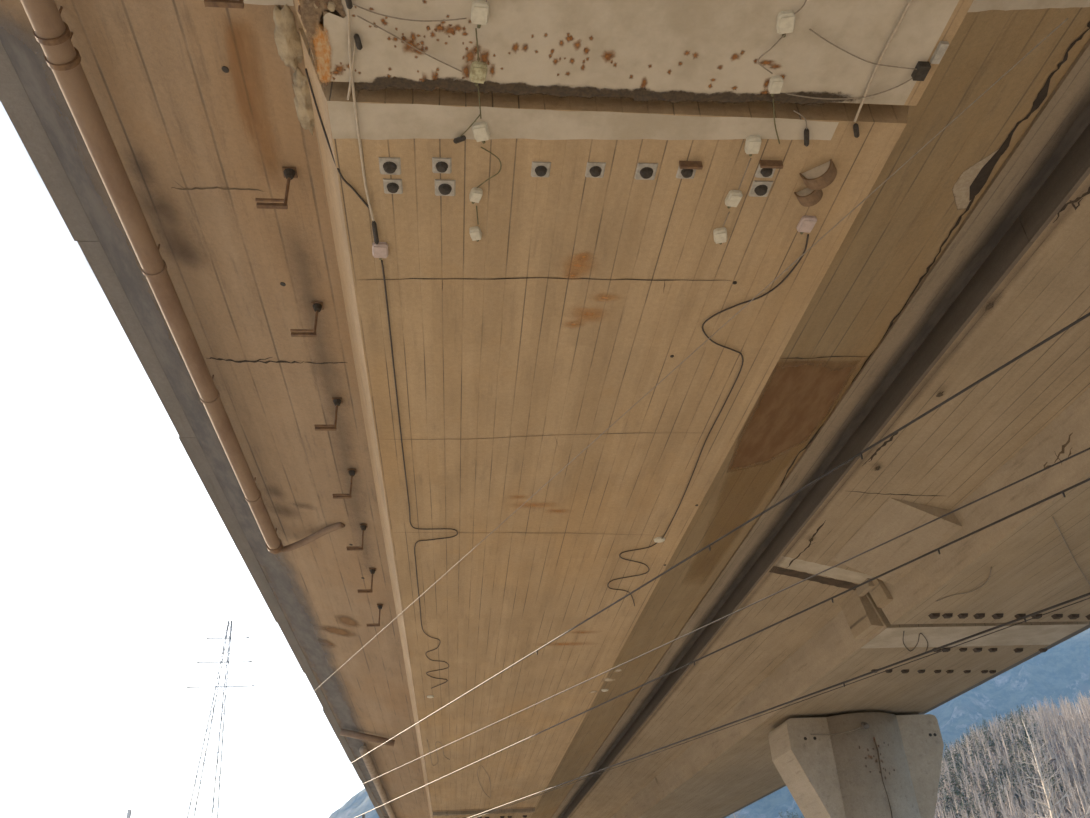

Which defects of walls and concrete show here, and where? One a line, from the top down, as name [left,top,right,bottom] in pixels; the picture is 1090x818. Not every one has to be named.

spalling [298,0,346,89]
corrosion [369,8,503,90]
corrosion [509,33,593,76]
crack [172,182,261,191]
crack [780,21,1090,382]
spalling [952,149,999,209]
crack [207,356,348,364]
crack [780,425,823,486]
crack [1044,433,1073,468]
crack [873,737,893,818]